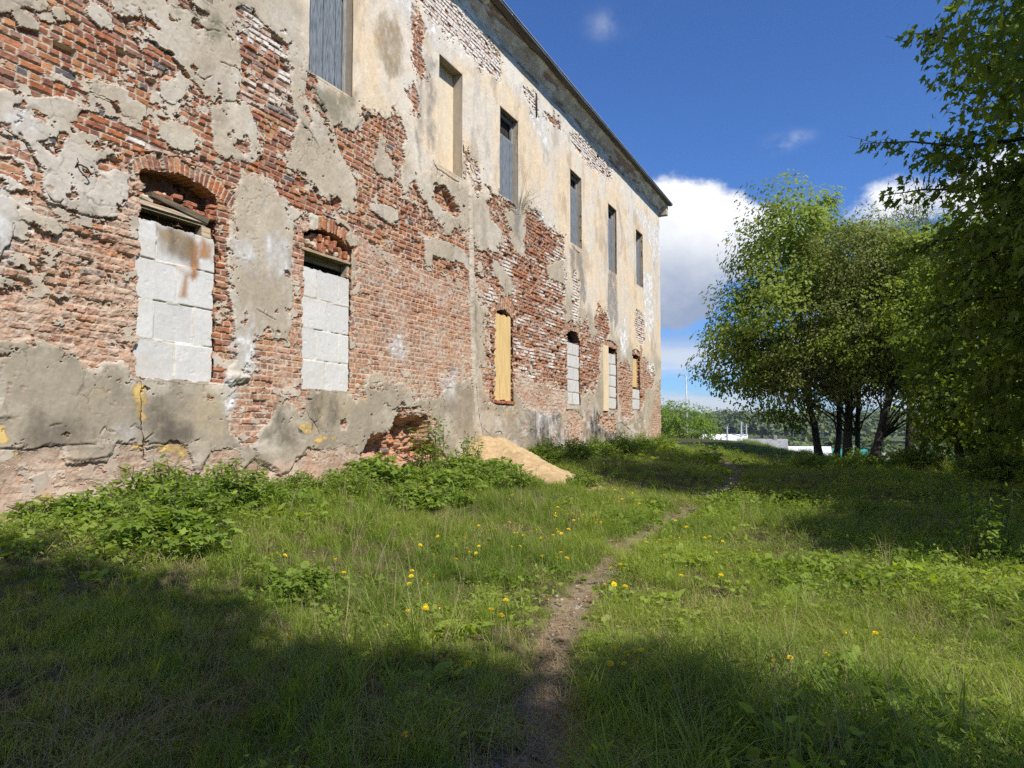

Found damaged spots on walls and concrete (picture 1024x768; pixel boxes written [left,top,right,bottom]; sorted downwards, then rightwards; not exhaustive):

crack [10,381,180,459]
spalling [0,0,661,522]